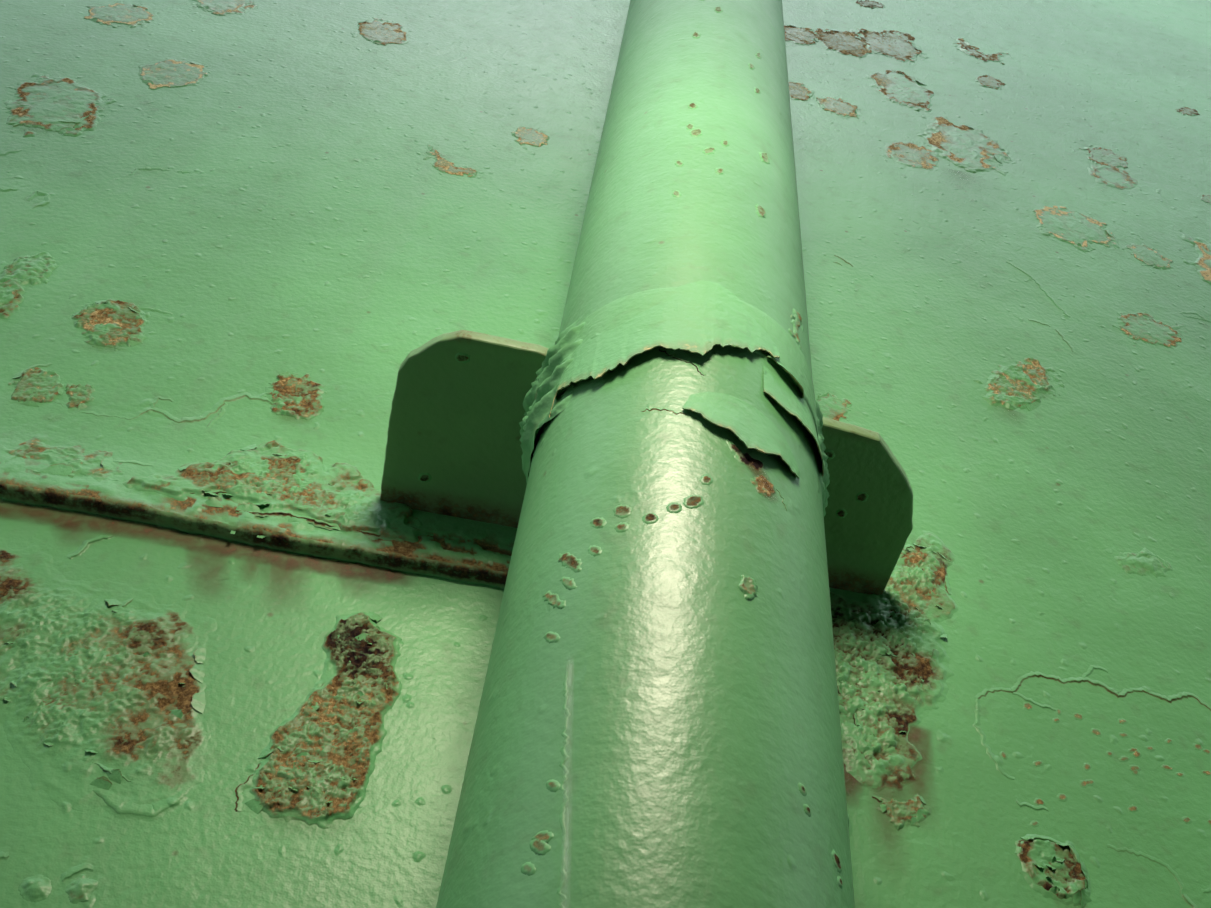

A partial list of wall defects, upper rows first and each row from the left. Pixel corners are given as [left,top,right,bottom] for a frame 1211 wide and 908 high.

spalling [71,299,173,351]
crack [54,392,283,429]
spalling [264,371,327,420]
peeling [549,280,835,479]
spalling [973,358,1065,411]
spalling [122,440,434,543]
hole [590,474,713,533]
spalling [543,545,602,609]
spalling [830,530,958,832]
spalling [234,611,402,829]
crack [972,665,1211,812]
spalling [1015,834,1092,908]